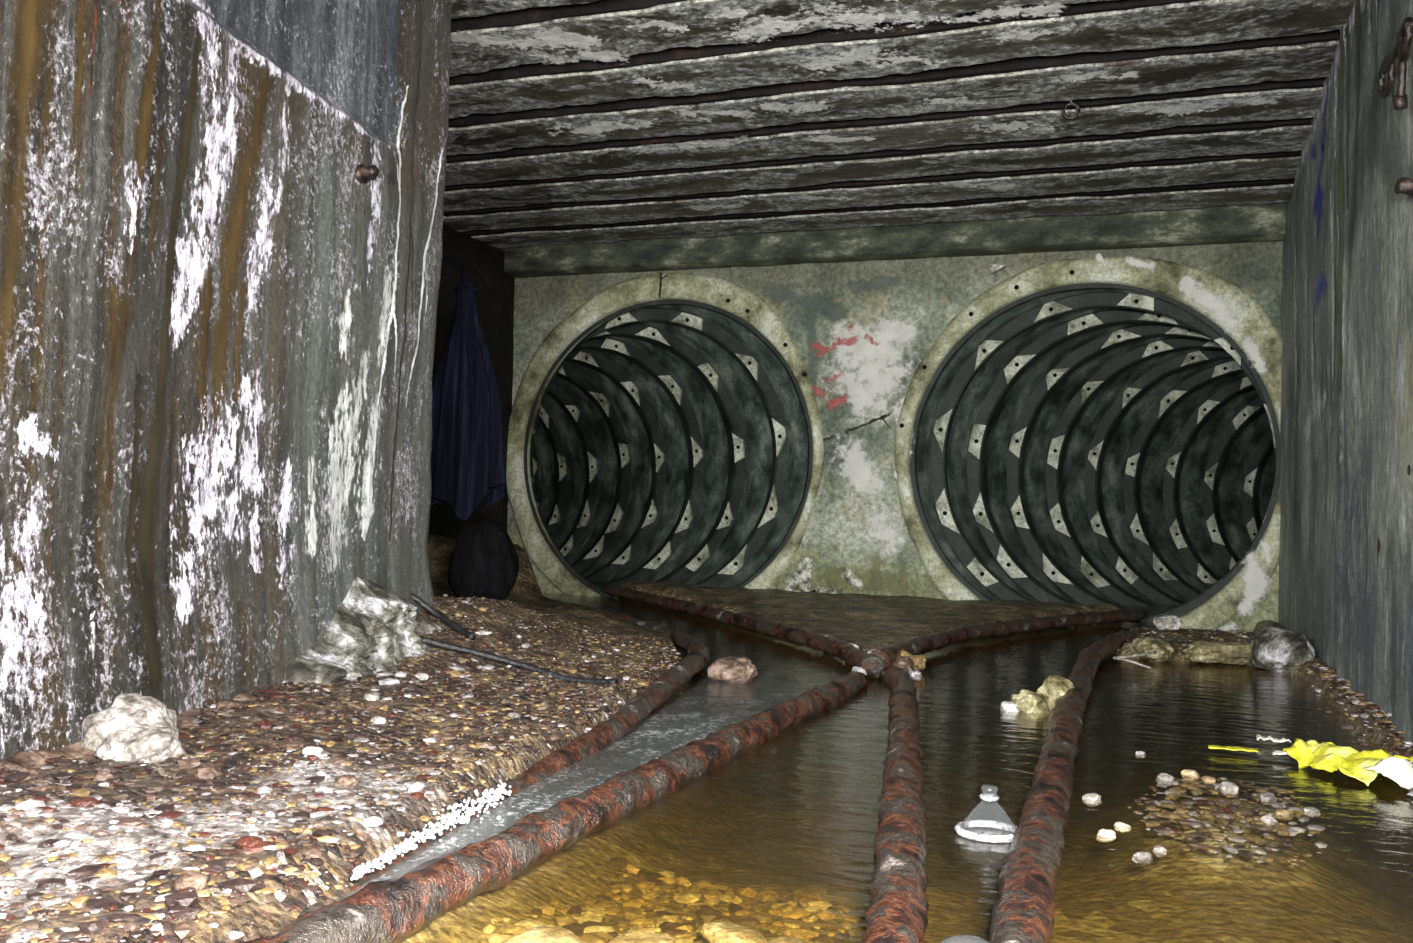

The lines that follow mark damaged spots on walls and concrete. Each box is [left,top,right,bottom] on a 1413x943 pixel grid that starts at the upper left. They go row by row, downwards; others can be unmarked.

water stain [13,414,59,462]
corrosion [98,0,162,508]
corrosion [198,70,274,437]
water stain [123,0,396,688]
water stain [0,481,99,773]
water stain [176,708,201,730]
water stain [233,692,258,701]
water stain [284,577,448,686]